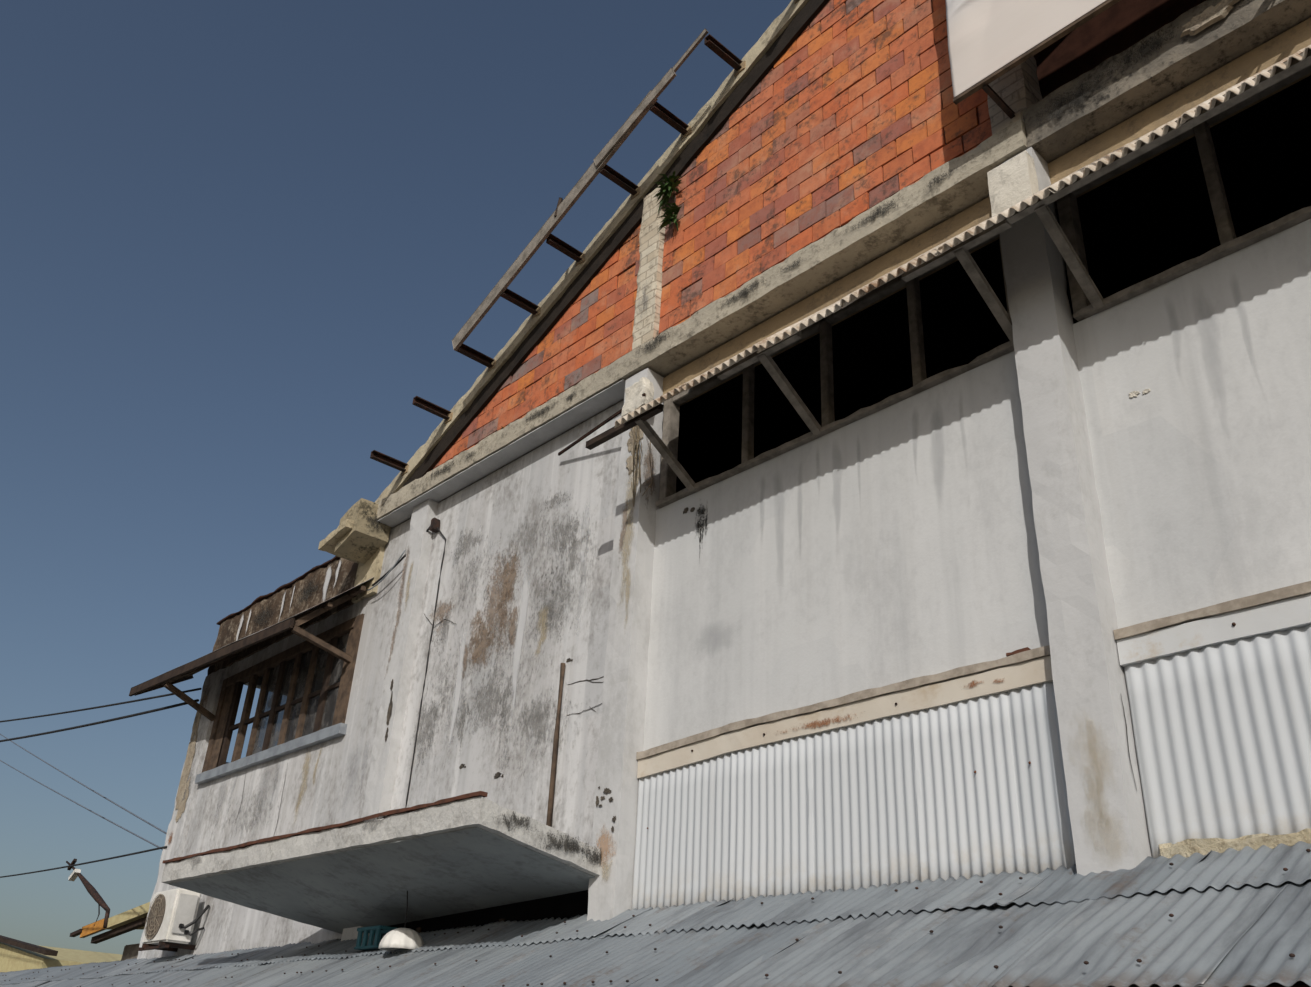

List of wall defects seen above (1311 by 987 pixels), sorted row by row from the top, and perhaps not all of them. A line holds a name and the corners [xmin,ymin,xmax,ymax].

spalling [1180,0,1240,38]
damp [683,499,708,558]
damp [414,493,589,765]
corrosion [783,714,851,733]